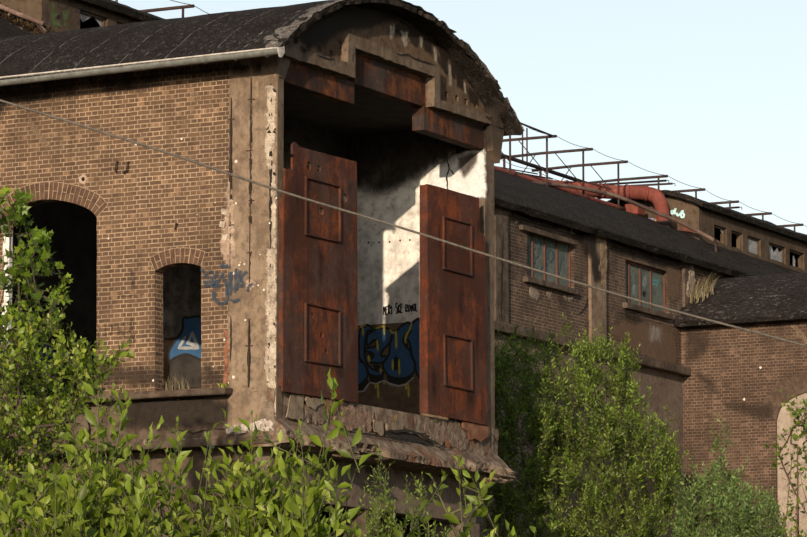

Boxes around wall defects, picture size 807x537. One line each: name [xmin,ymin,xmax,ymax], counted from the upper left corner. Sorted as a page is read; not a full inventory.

spalling [219,98,235,270]
spalling [223,315,232,385]
spalling [226,77,490,451]